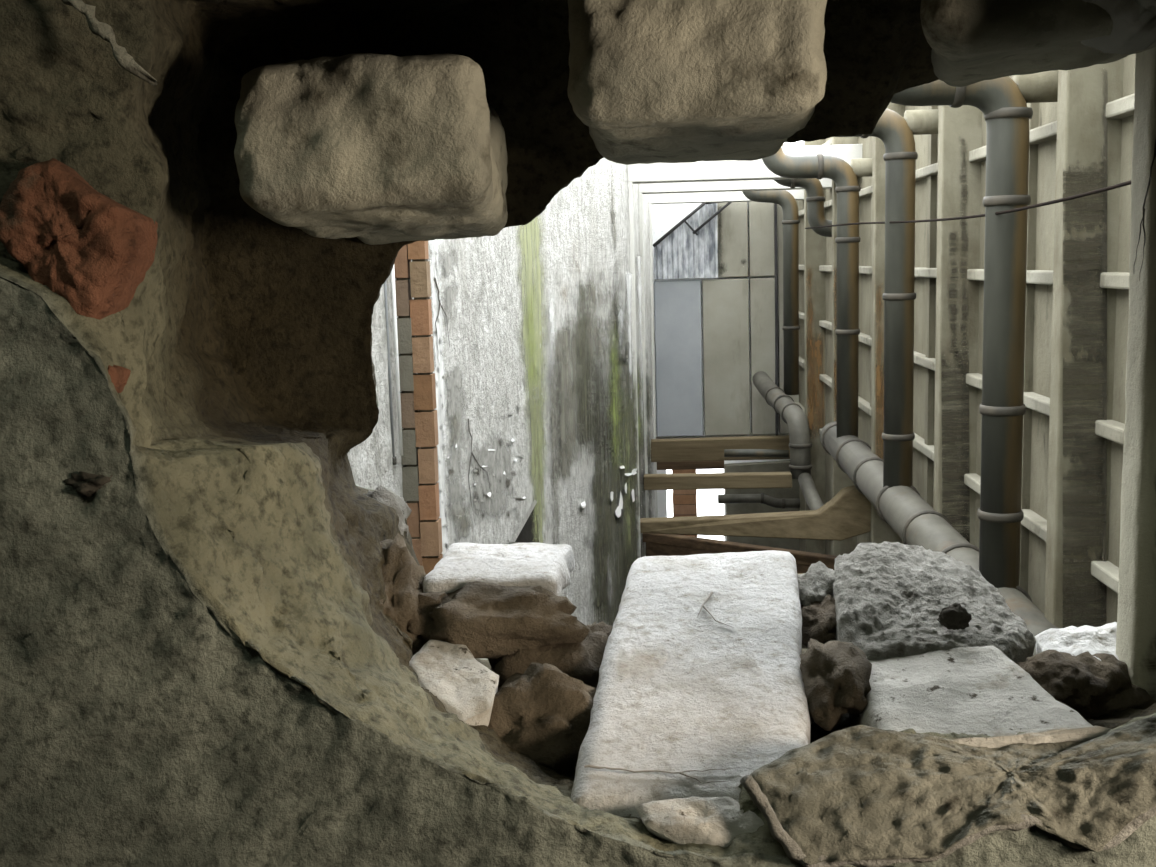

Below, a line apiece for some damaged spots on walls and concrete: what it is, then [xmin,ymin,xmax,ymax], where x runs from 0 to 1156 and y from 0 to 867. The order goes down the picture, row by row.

crack [1134,139,1156,281]
flaking render [429,239,539,555]
damp [519,217,651,626]
peeling [610,466,637,518]
spalling [409,639,499,727]
spalling [937,603,972,630]
spalling [634,716,1156,867]